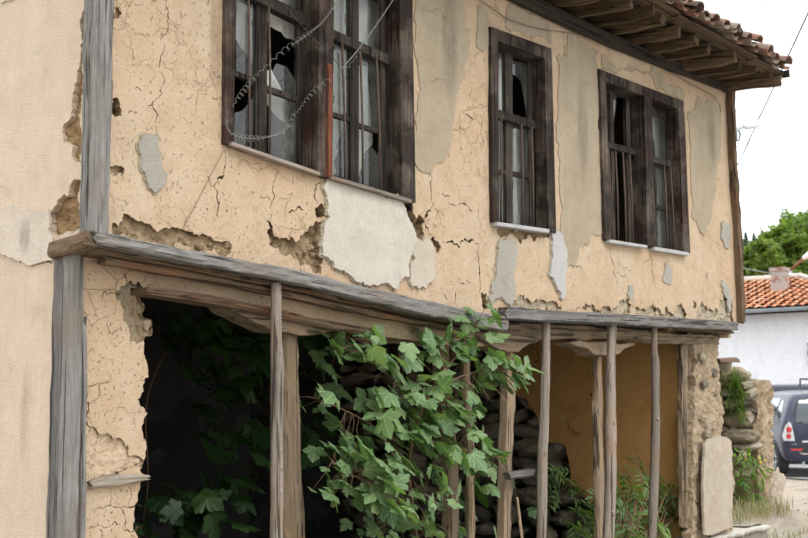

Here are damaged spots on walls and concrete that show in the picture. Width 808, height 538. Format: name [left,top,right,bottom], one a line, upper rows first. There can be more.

spalling [62,10,84,162]
crack [134,0,169,131]
spalling [112,213,232,256]
crack [208,150,226,218]
crack [261,165,321,236]
peeling [267,179,436,291]
crack [418,173,481,306]
peeling [487,34,685,311]
spalling [115,280,153,343]
spalling [576,280,734,332]
spalling [86,421,143,480]
crack [89,488,141,536]